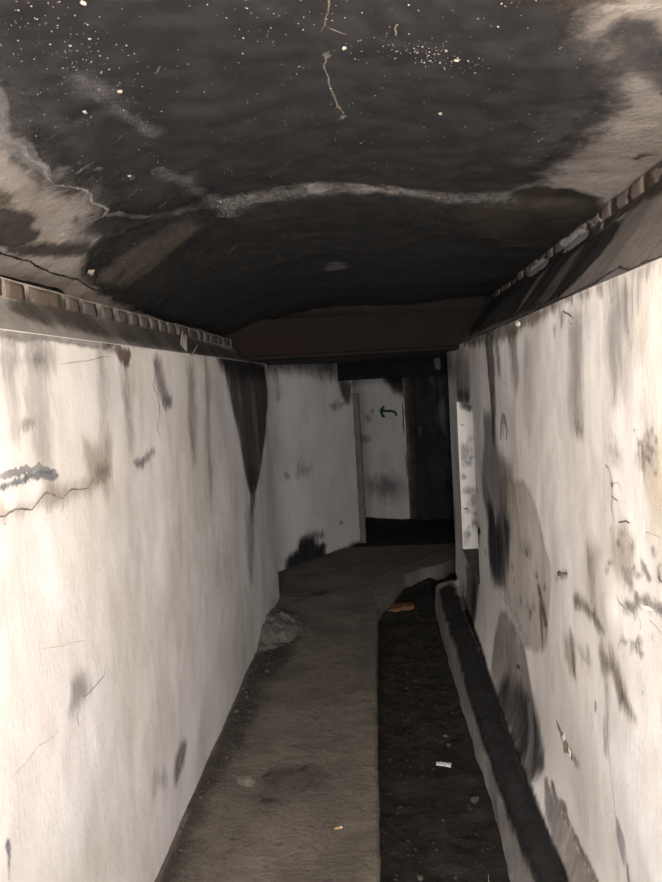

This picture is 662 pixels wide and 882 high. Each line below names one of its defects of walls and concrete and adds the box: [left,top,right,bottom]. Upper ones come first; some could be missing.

leakage [608,19,662,86]
leakage [73,75,157,136]
leakage [0,136,222,286]
crack [0,252,127,302]
leakage [218,358,265,379]
crack [0,476,95,525]
crack [605,464,630,524]
leakage [601,651,624,704]
leakage [492,613,593,882]